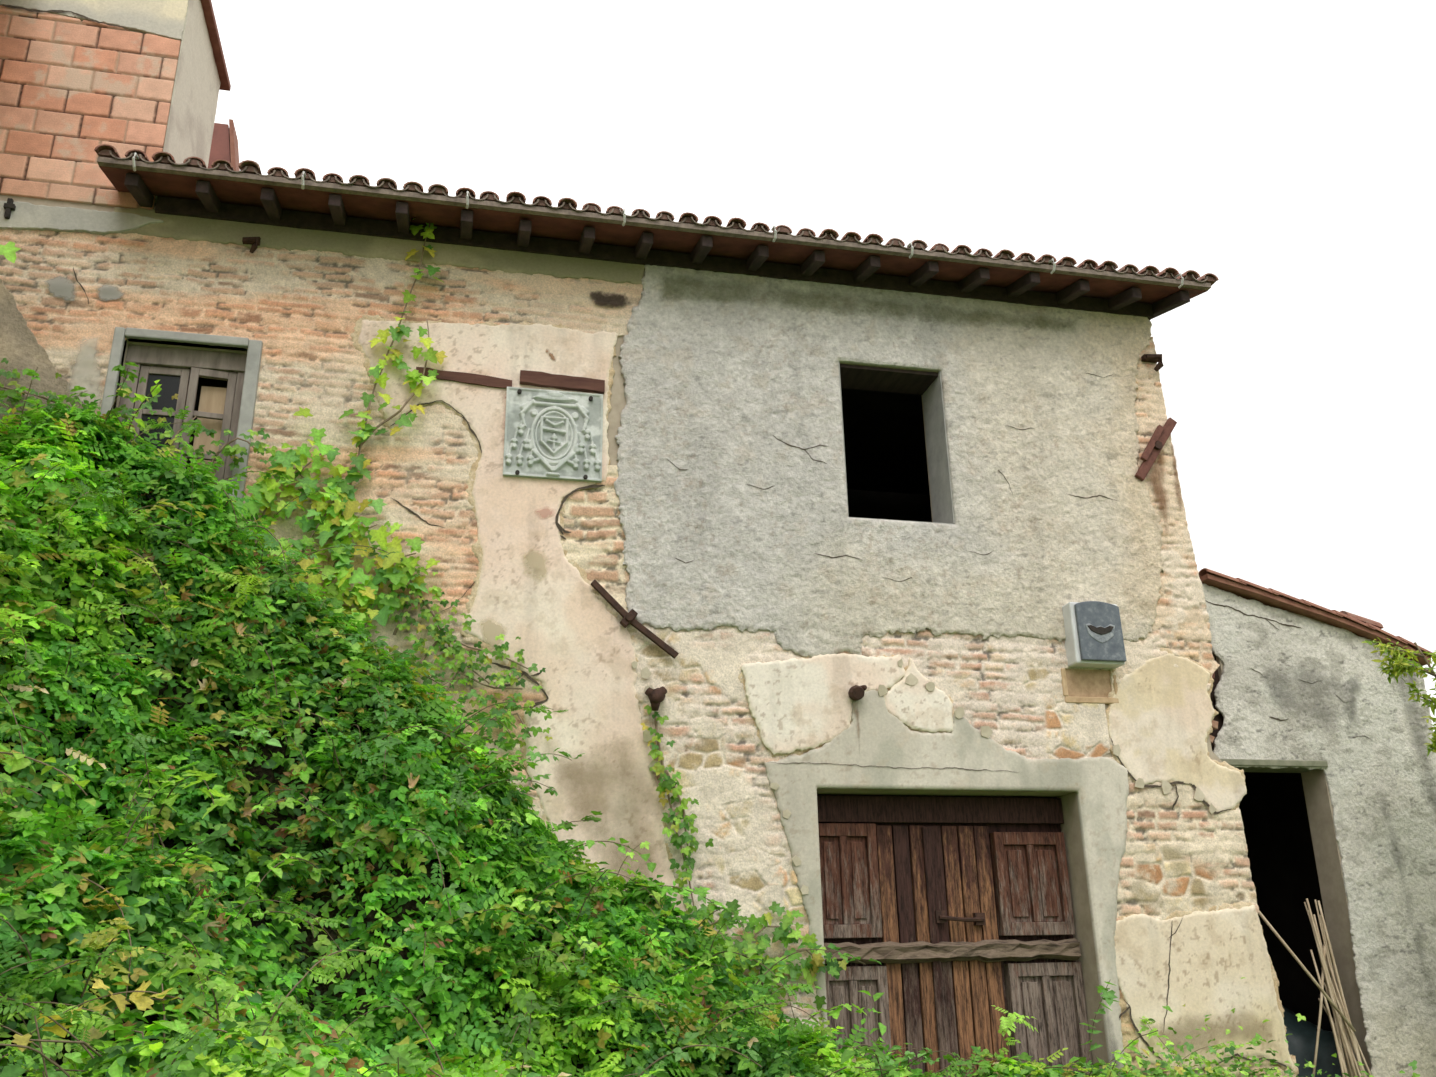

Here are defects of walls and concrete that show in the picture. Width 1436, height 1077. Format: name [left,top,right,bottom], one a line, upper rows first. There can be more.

flaking render [0,229,643,822]
flaking render [838,337,1220,760]
crack [1205,600,1301,630]
flaking render [560,465,822,1034]
crack [1111,739,1231,814]
flaking render [1116,775,1259,921]
crack [1209,651,1260,751]
crack [1118,920,1182,1060]